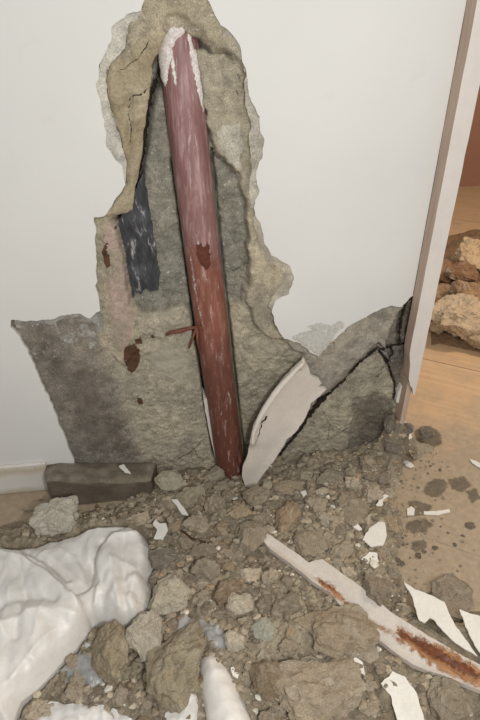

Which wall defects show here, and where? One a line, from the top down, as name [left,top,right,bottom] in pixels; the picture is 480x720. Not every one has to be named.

corrosion [196,243,211,270]
spalling [11,0,415,488]
crack [279,297,411,456]